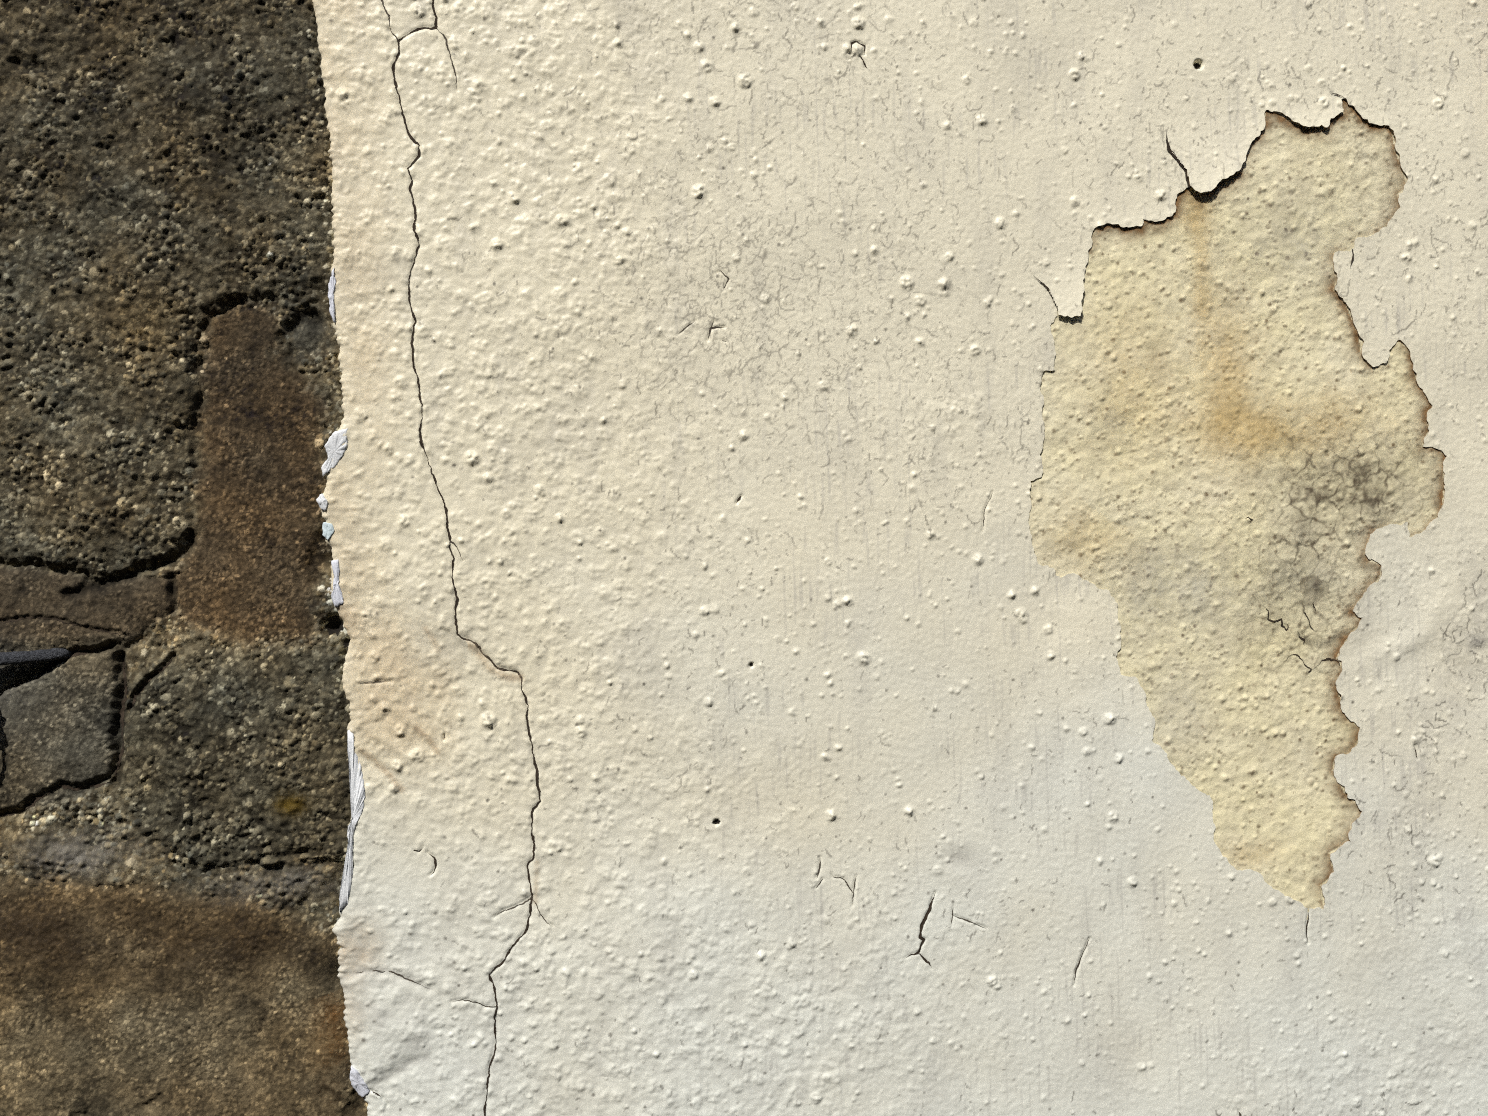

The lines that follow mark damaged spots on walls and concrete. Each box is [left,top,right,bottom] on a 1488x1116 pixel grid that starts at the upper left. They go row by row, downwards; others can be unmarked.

crack [357,0,549,1116]
crack [907,894,984,966]
peeling [1028,91,1446,919]